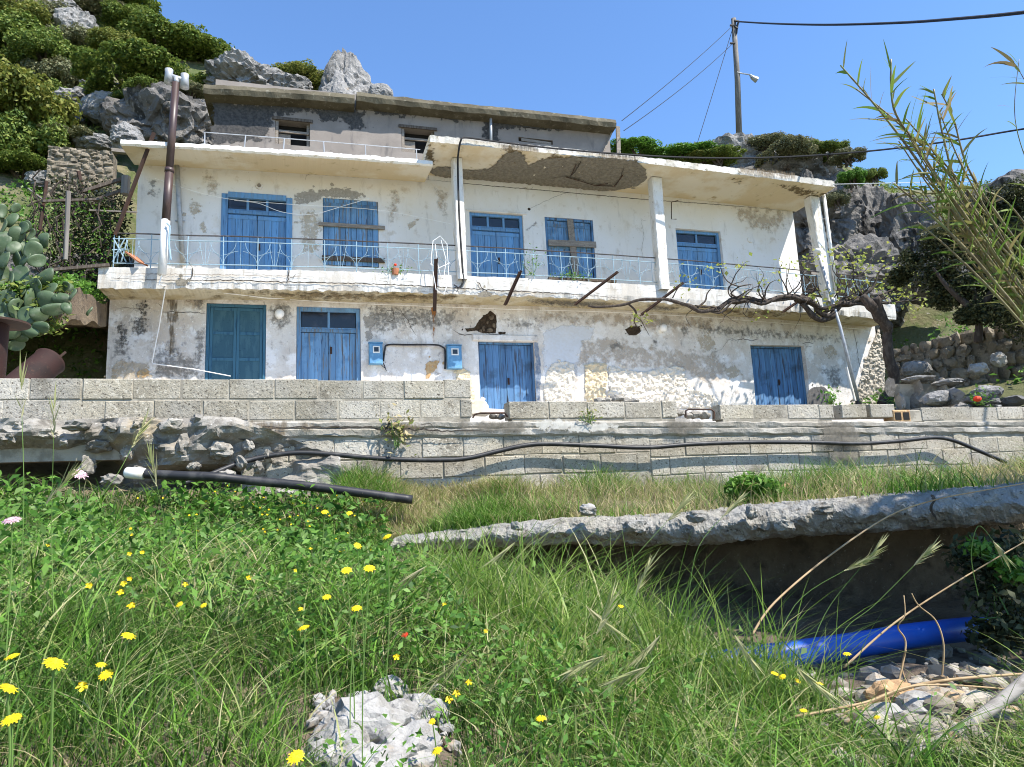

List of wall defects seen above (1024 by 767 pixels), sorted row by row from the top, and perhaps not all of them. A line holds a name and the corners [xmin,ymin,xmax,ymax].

spalling [430,151,647,191]
peeling [294,183,365,252]
leakage [118,300,149,344]
leakage [167,300,178,354]
spalling [625,325,642,335]
flaking render [539,359,719,409]